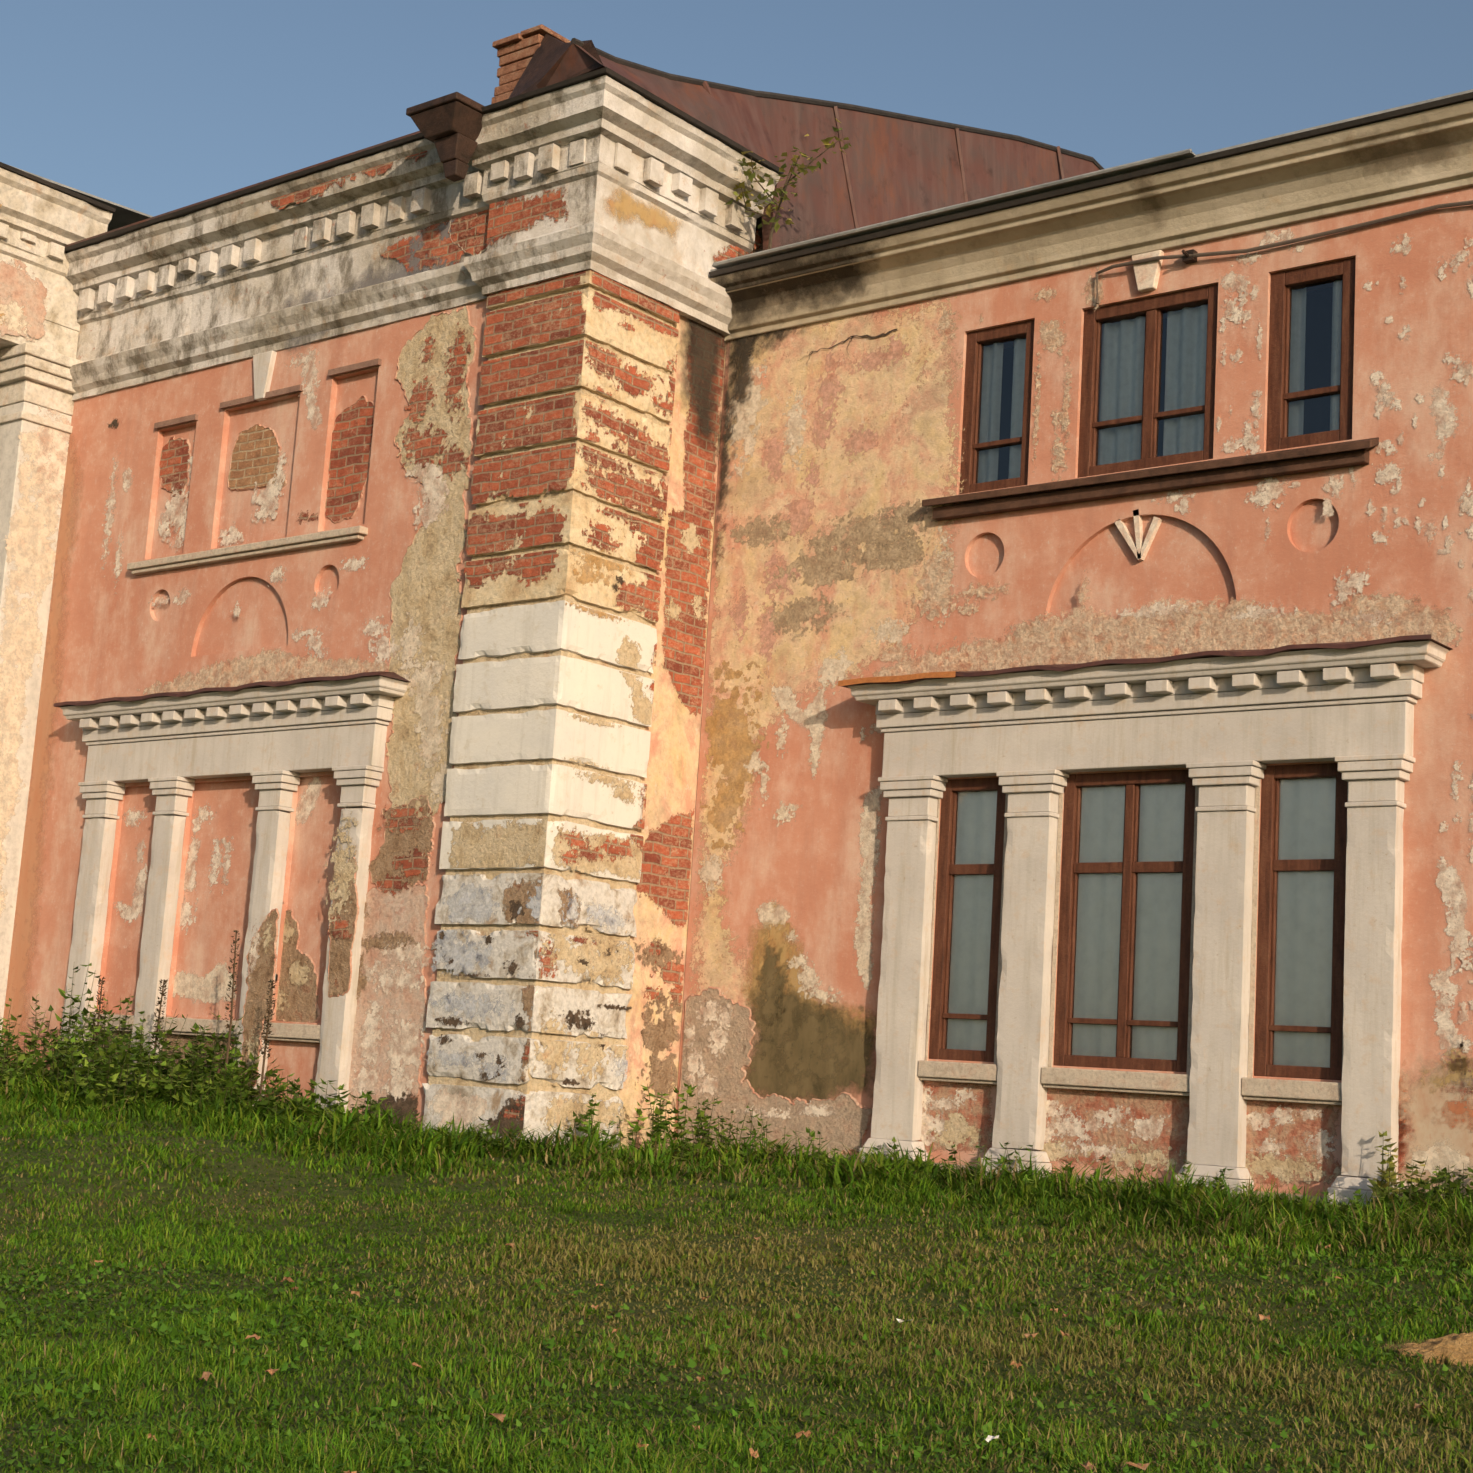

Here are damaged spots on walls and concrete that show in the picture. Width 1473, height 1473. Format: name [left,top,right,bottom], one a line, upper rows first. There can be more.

flaking render [0,259,47,343]
flaking render [262,151,427,210]
flaking render [380,187,569,273]
flaking render [714,230,763,262]
peeling [1219,228,1304,365]
leakage [684,245,874,564]
peeling [101,453,134,594]
flaking render [137,265,1473,1154]
leakage [742,905,876,1104]
flaking render [1032,1088,1191,1177]
flaking render [1242,1100,1342,1190]
leakage [1398,1048,1473,1202]